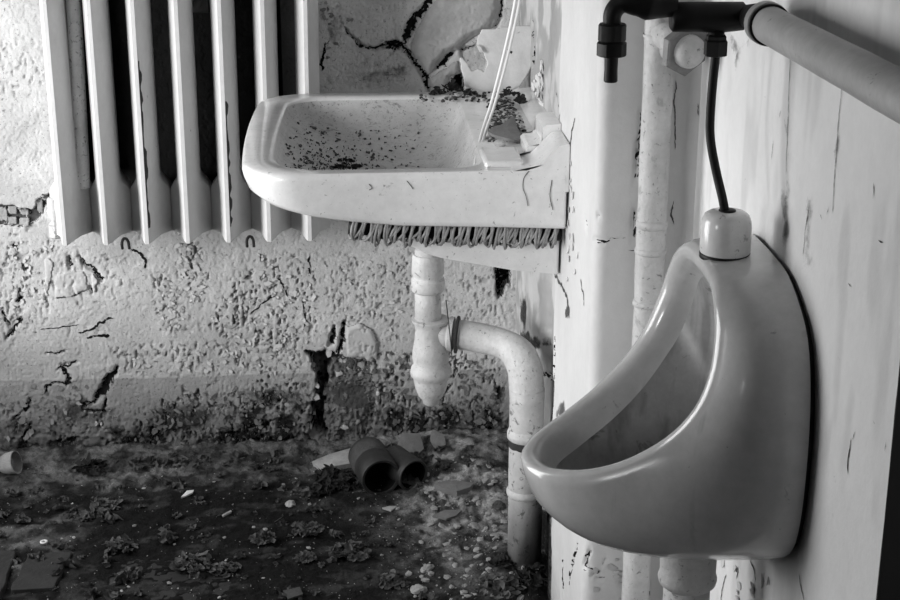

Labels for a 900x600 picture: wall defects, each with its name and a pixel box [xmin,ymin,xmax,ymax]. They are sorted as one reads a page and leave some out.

crack [319,0,474,89]
flaking render [0,194,50,227]
peeling [566,178,578,282]
crack [57,256,105,299]
spalling [494,267,514,300]
crack [325,321,346,355]
crack [1,310,113,447]
crack [86,366,118,413]